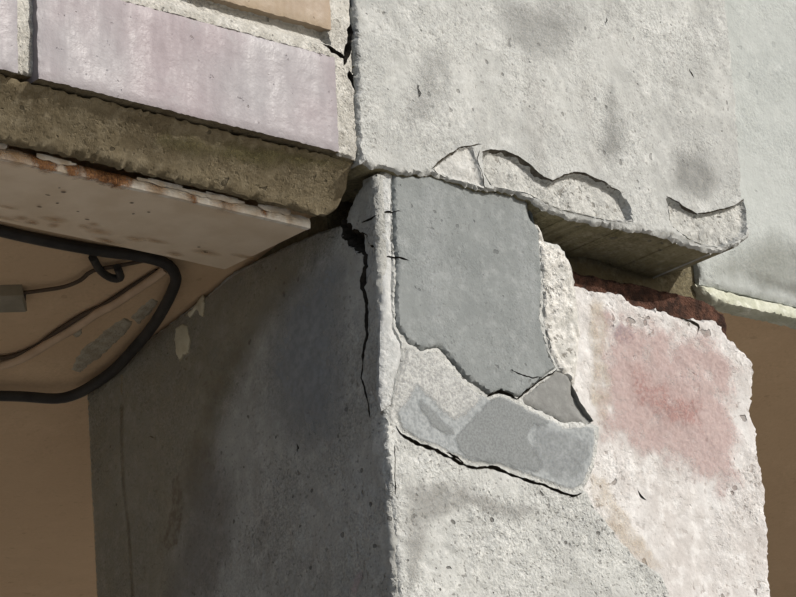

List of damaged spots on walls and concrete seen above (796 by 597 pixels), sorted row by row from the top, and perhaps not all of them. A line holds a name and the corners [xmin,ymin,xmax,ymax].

crack [323,0,355,90]
rust [27,153,133,188]
spalling [434,147,632,222]
spalling [666,199,747,248]
crack [340,210,407,417]
peeling [390,349,480,420]
crack [394,426,581,497]